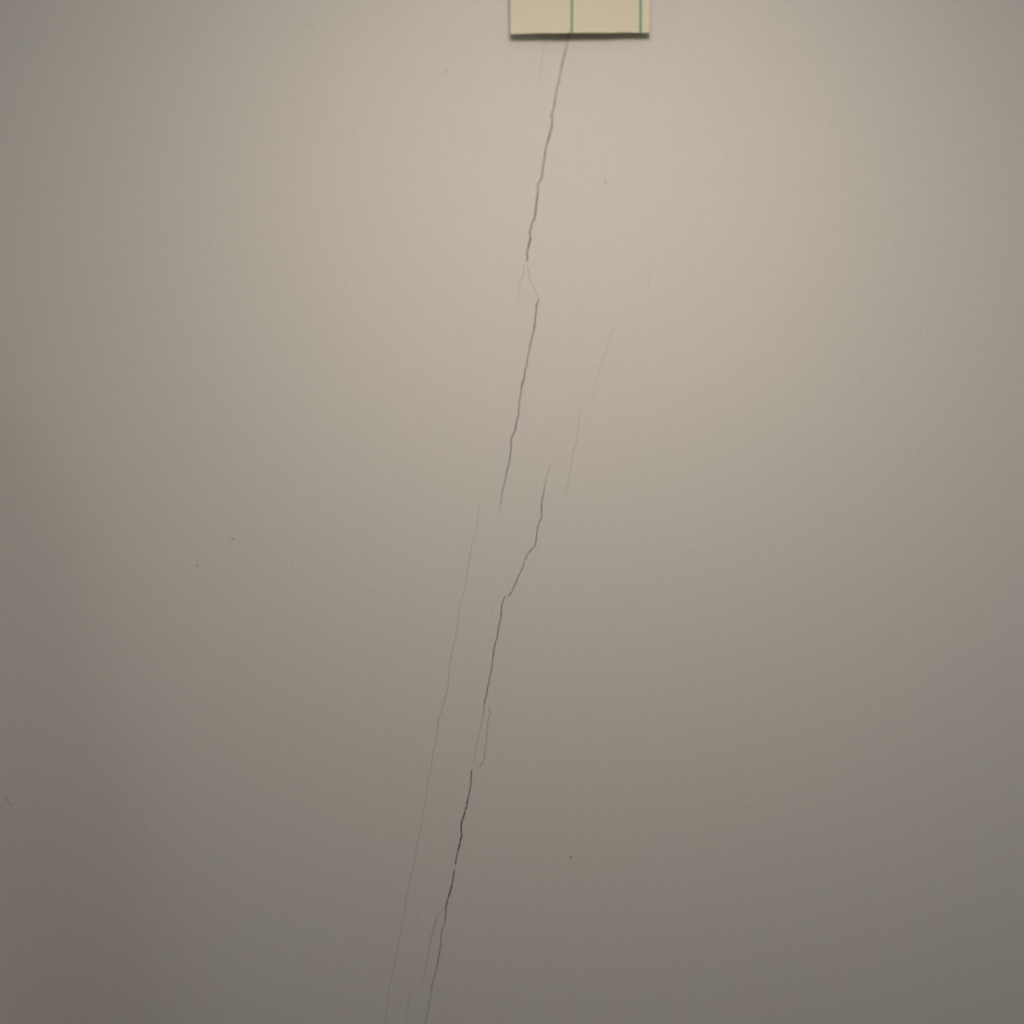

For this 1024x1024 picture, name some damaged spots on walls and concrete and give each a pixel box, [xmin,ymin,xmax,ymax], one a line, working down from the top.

crack [384,33,570,1024]